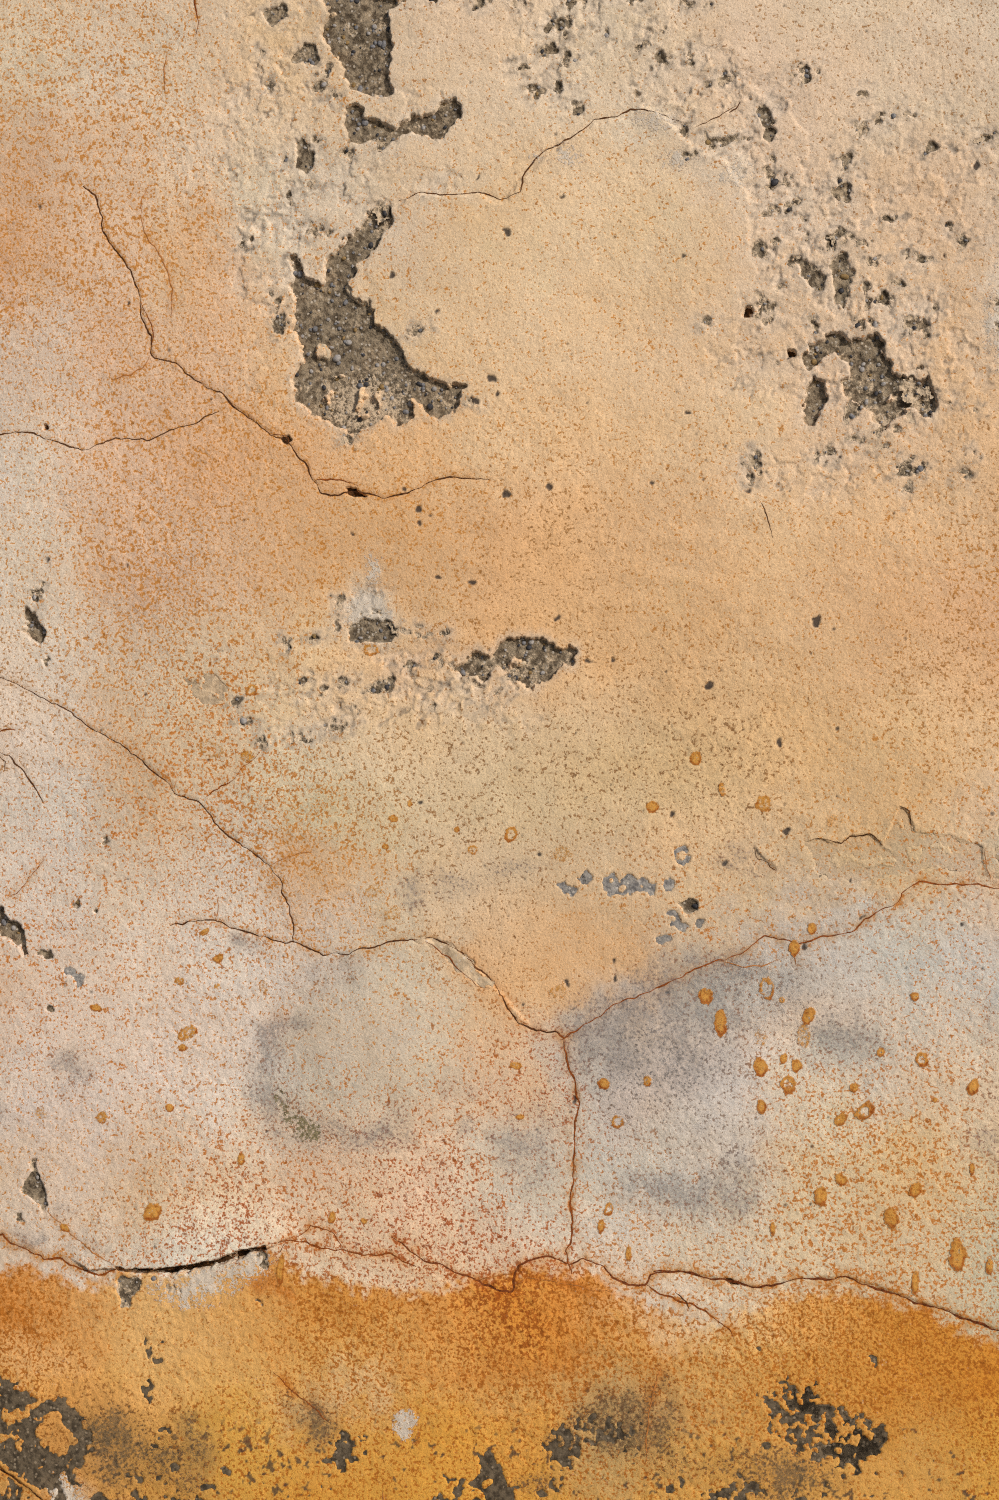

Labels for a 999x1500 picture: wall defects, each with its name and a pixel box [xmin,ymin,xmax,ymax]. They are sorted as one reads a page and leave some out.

flaking render [262,3,288,27]
flaking render [281,0,462,206]
crack [0,186,482,498]
flaking render [269,202,475,445]
flaking render [679,105,979,463]
flaking render [279,595,577,744]
crack [0,677,999,1342]
peeling [0,1376,113,1500]
peeling [141,1338,164,1404]
peeling [432,1412,644,1500]
peeling [701,1473,765,1500]
peeling [756,1376,888,1500]